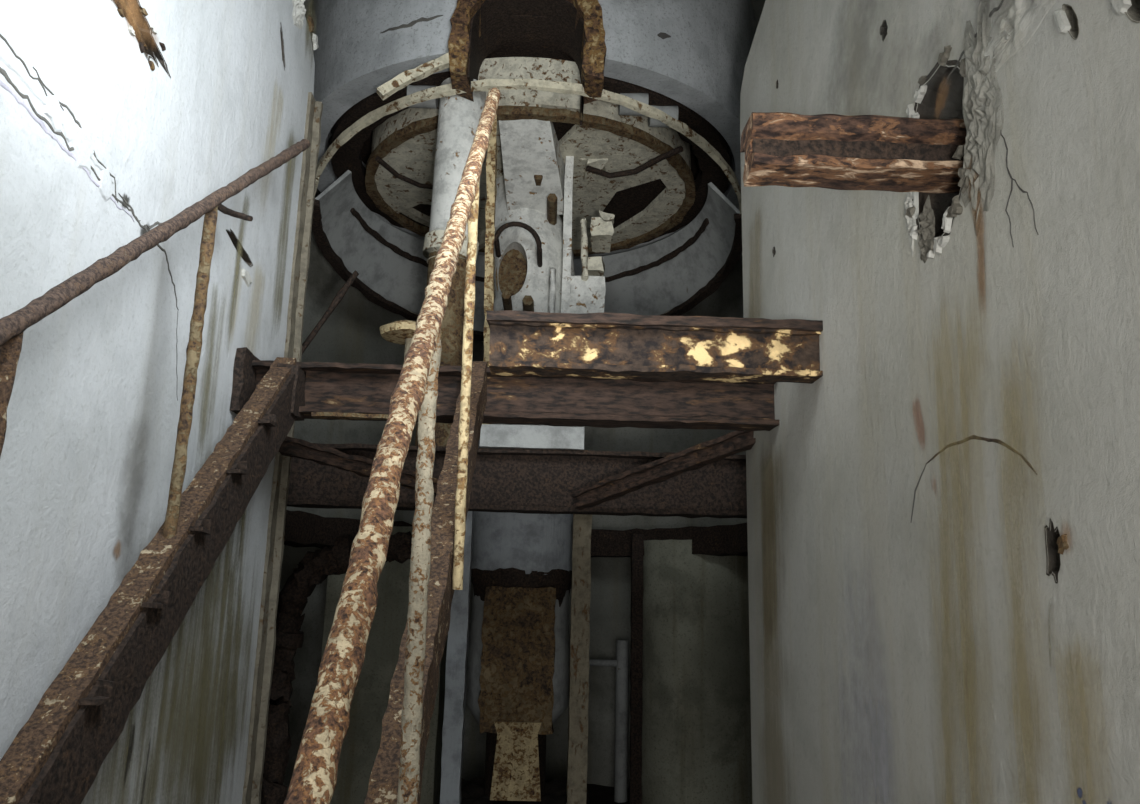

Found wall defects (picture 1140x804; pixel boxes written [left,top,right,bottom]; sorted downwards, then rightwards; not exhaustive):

spalling [111,0,171,78]
spalling [1054,4,1079,40]
spalling [1111,0,1140,23]
spalling [904,0,1004,296]
crack [0,34,178,401]